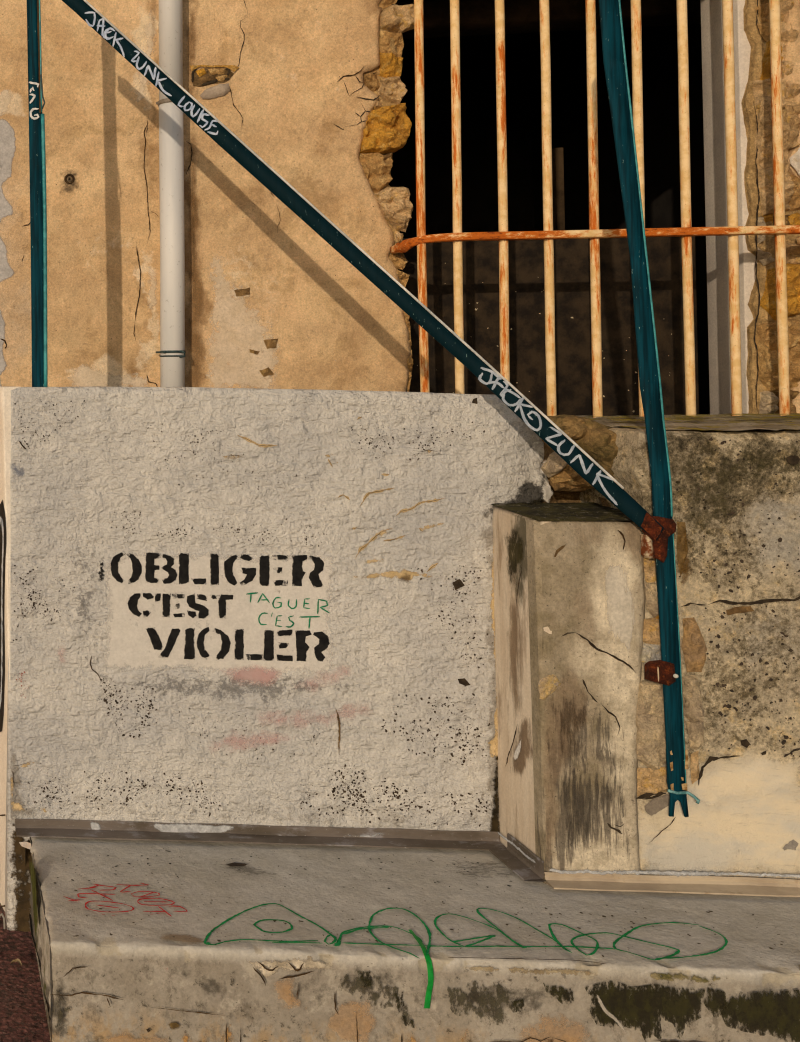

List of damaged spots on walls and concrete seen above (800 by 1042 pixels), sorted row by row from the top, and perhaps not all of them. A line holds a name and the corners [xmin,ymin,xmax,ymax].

crack [229,1,248,123]
peeling [0,237,14,282]
peeling [0,90,16,221]
spalling [359,0,414,287]
spalling [753,0,800,414]
crack [563,632,634,670]
crack [682,596,800,607]
water stain [563,769,615,849]